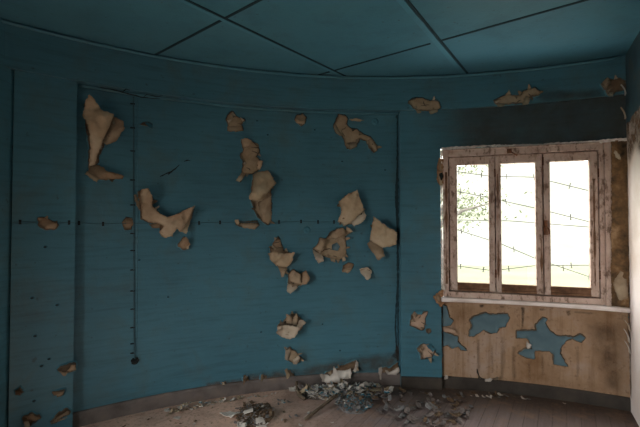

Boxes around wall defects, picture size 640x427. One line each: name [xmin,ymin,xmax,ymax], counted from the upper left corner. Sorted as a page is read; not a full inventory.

peeling [82,95,125,182]
peeling [225,110,276,230]
peeling [332,114,382,154]
peeling [407,96,442,114]
peeling [492,84,543,107]
peeling [121,188,195,251]
peeling [268,236,310,294]
peeling [312,190,397,280]
peeling [416,138,631,397]
peeling [276,311,306,379]
peeling [409,310,432,335]